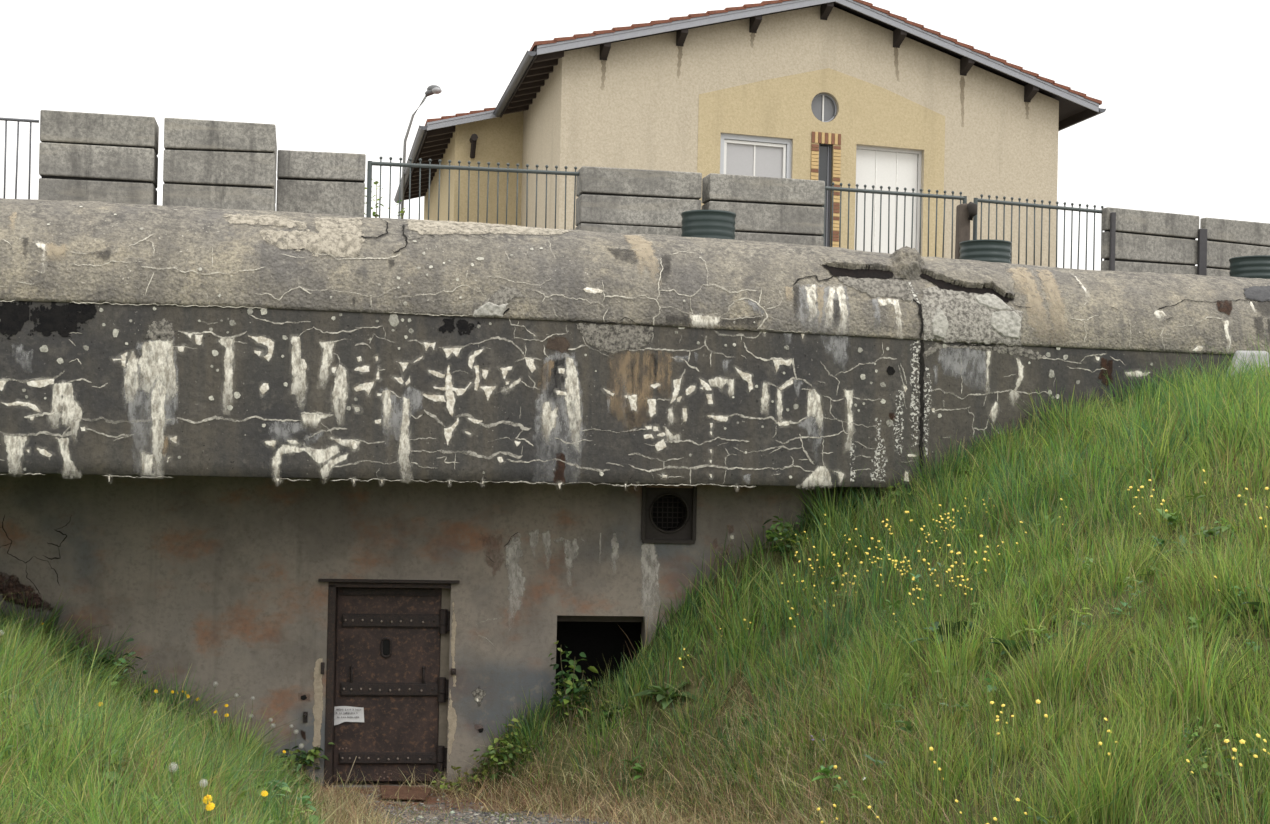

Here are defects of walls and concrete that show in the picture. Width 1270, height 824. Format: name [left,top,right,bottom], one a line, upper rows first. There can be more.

water stain [0,379,82,469]
water stain [112,331,247,472]
water stain [291,336,348,414]
crack [67,219,1050,484]
water stain [535,352,583,435]
rust [603,350,689,417]
water stain [761,358,823,444]
spalling [793,254,1046,360]
crack [1041,274,1270,373]
rust [554,453,565,488]
spalling [0,572,54,612]
crack [1,515,72,593]